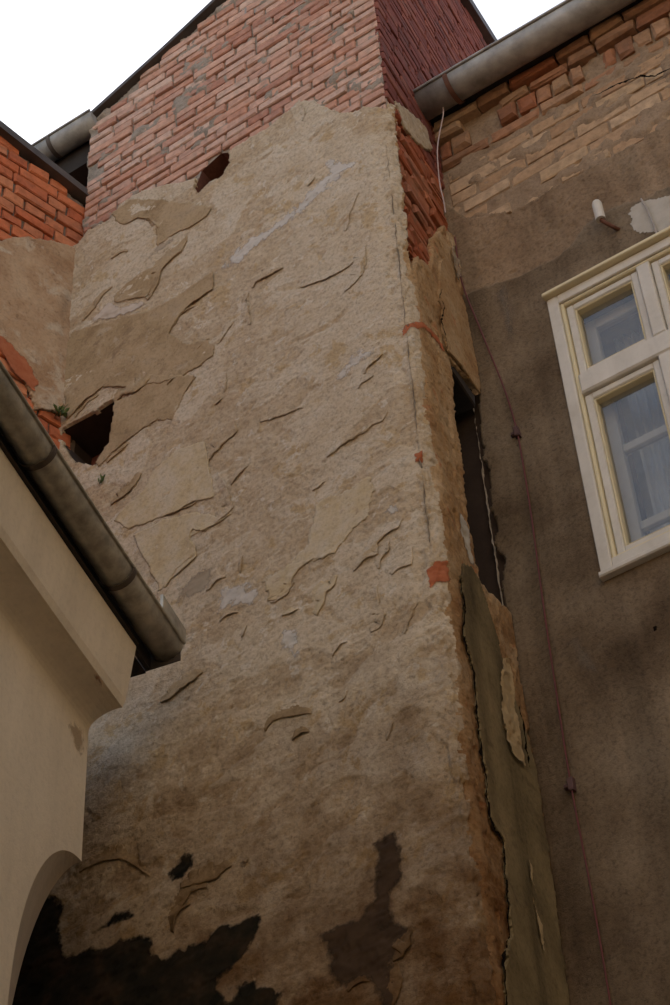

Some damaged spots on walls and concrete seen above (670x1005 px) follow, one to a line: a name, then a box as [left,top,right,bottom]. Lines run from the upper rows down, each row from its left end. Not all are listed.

peeling [64,153,355,467]
flaking render [394,101,481,394]
flaking render [628,195,670,233]
peeling [110,472,142,505]
peeling [176,477,375,622]
peeling [263,702,312,740]
peeling [426,514,570,1005]
peeling [168,858,249,933]
damp [321,832,408,1005]